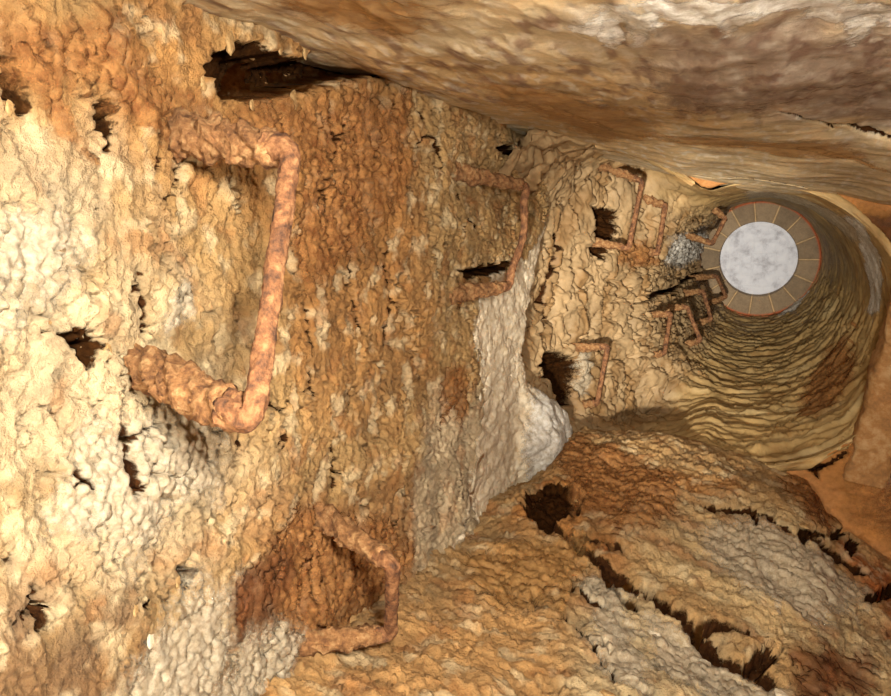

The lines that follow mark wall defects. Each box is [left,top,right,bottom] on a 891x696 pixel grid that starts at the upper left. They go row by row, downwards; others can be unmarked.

crack [788,113,891,139]
corrosion [214,156,243,166]
corrosion [229,91,413,298]
corrosion [618,240,661,268]
corrosion [147,380,171,404]
corrosion [229,507,385,649]
corrosion [342,513,414,579]
crack [704,505,891,604]